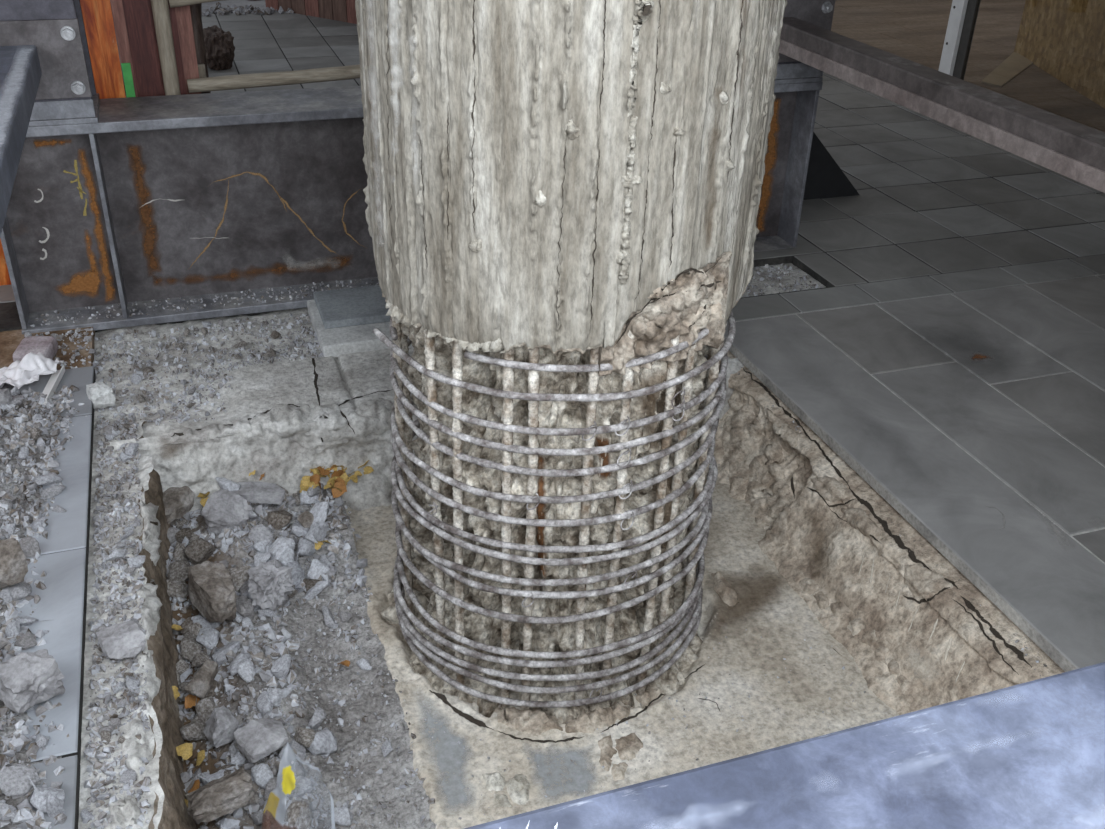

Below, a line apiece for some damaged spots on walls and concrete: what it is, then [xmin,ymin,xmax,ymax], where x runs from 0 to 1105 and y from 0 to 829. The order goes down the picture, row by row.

corrosion [60,151,115,301]
corrosion [129,146,349,284]
spalling [386,300,531,353]
spalling [626,270,723,342]
crack [741,367,1032,675]
spalling [459,691,481,707]
spalling [494,688,664,735]